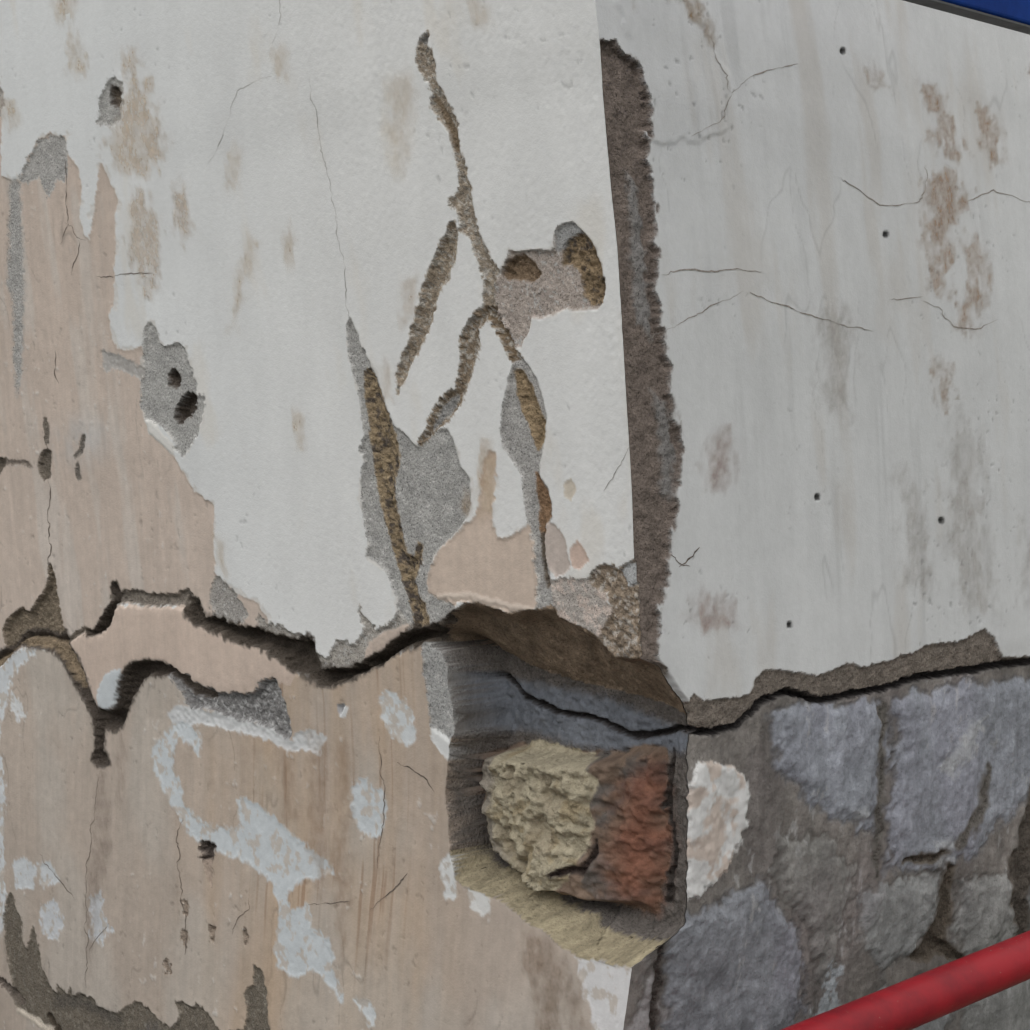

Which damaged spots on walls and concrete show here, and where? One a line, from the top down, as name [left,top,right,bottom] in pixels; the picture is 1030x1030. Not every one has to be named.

spalling [95,77,124,127]
crack [839,167,928,206]
crack [648,268,871,339]
crack [892,296,998,330]
peeling [0,88,306,721]
crack [0,29,553,982]
crack [672,547,700,567]
spalling [420,37,1030,1030]
spalling [316,602,414,669]
spalling [0,757,270,1030]